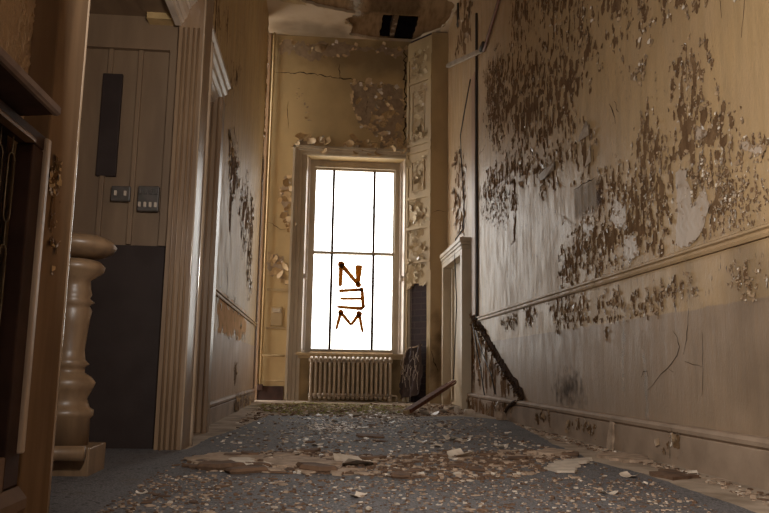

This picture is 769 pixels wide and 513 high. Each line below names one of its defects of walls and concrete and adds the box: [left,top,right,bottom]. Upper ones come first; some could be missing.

peeling [454,0,472,59]
crack [274,64,368,129]
peeling [217,129,263,342]
peeling [262,249,288,285]
peeling [277,174,297,232]
peeling [290,78,430,286]
peeling [450,149,467,237]
peeling [478,0,769,342]
crack [641,310,703,390]